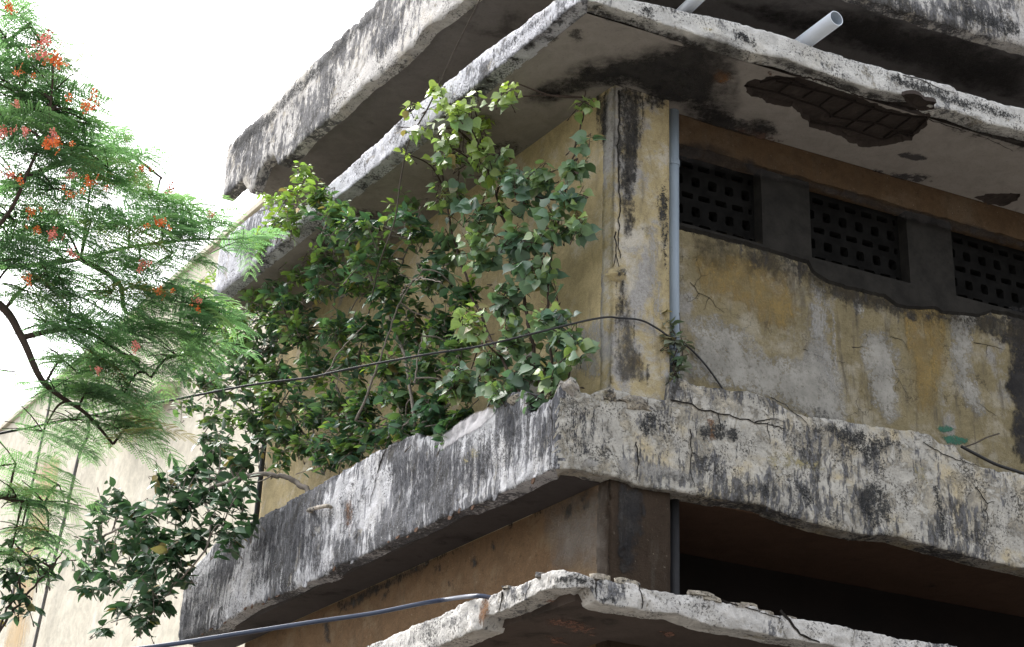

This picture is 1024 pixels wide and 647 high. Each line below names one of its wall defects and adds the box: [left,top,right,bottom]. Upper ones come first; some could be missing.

leakage [234,8,374,155]
crack [613,90,621,266]
leakage [472,5,776,315]
spalling [744,71,937,182]
spalling [974,193,1020,206]
crack [690,259,725,313]
leakage [695,237,1024,466]
leakage [496,407,603,472]
crack [647,397,810,487]
leakage [854,482,893,534]
peeling [589,573,644,590]
peeling [687,590,797,619]